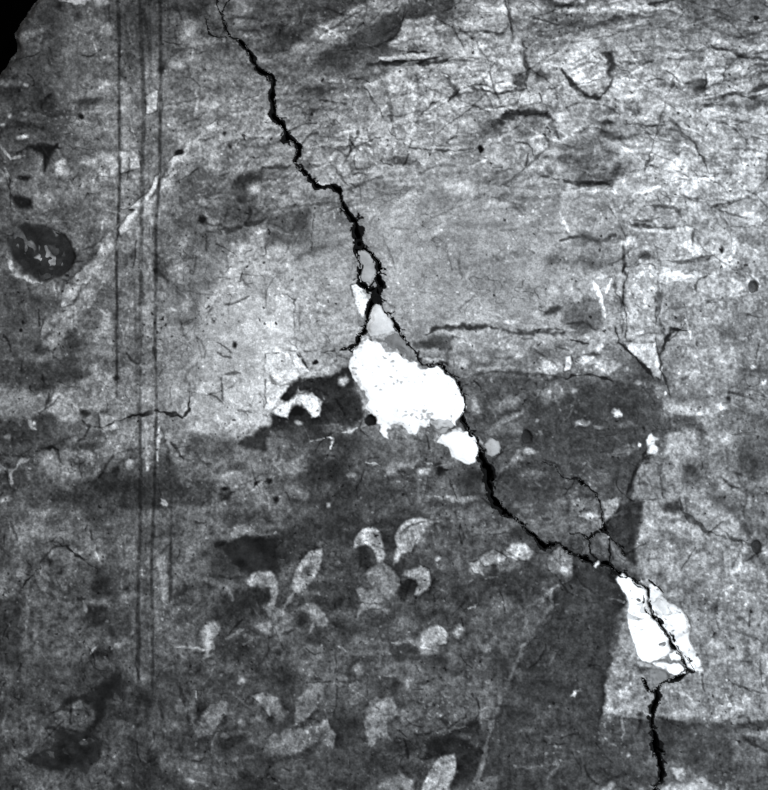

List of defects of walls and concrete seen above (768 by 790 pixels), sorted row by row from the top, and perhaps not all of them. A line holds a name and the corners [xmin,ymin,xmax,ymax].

crack [205,0,695,790]